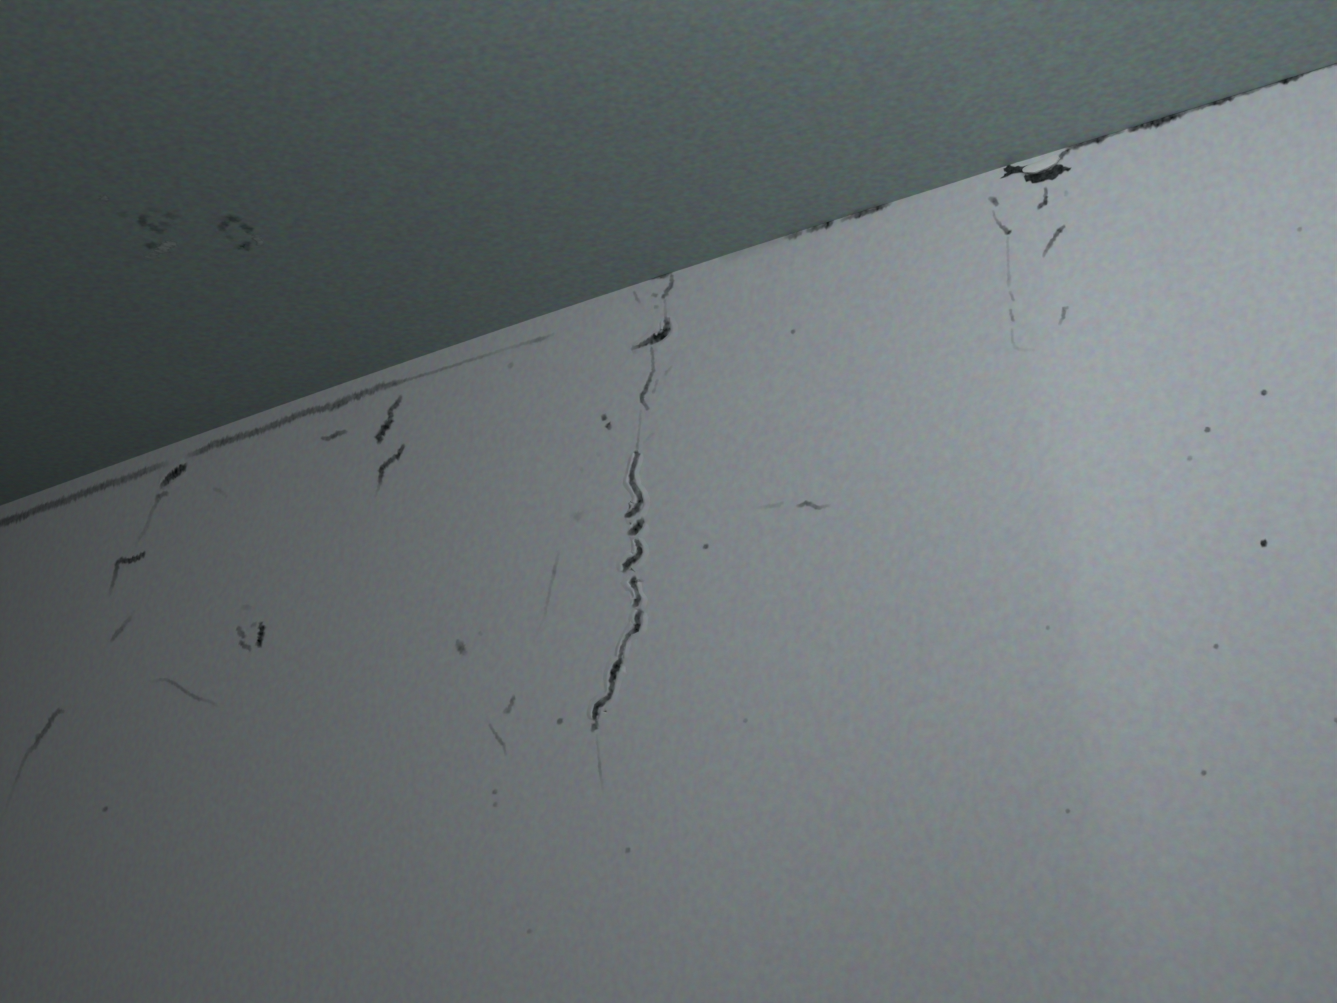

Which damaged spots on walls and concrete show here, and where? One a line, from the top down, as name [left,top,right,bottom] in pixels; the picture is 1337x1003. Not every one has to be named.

spalling [1001,150,1071,183]
crack [813,205,882,229]
crack [632,317,678,402]
crack [376,402,404,478]
crack [158,456,188,492]
crack [115,552,144,565]
crack [586,451,650,725]